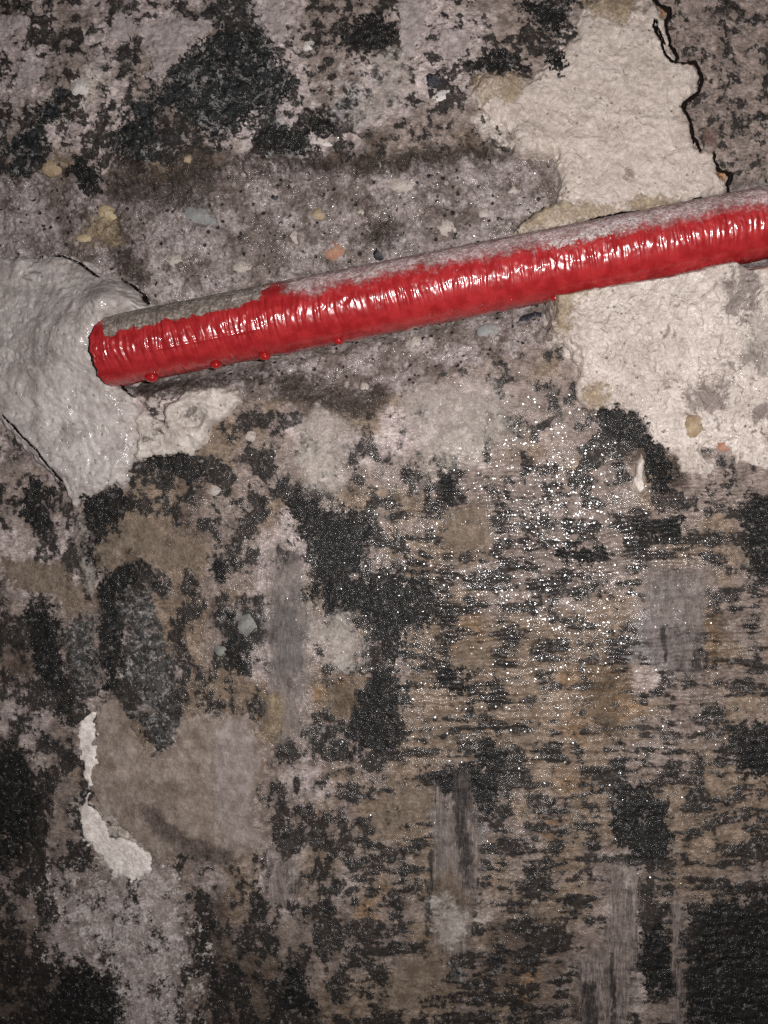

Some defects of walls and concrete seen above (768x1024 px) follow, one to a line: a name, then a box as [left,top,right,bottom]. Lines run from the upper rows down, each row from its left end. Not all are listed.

leakage [66,11,409,284]
leakage [463,0,578,78]
crack [576,210,638,223]
crack [652,0,733,200]
crack [2,414,63,482]
leakage [22,480,186,757]
leakage [134,370,522,762]
leakage [586,403,687,544]
leakage [26,854,216,1024]
flaking render [77,697,262,883]
leakage [421,734,509,983]
leakage [576,777,768,1024]